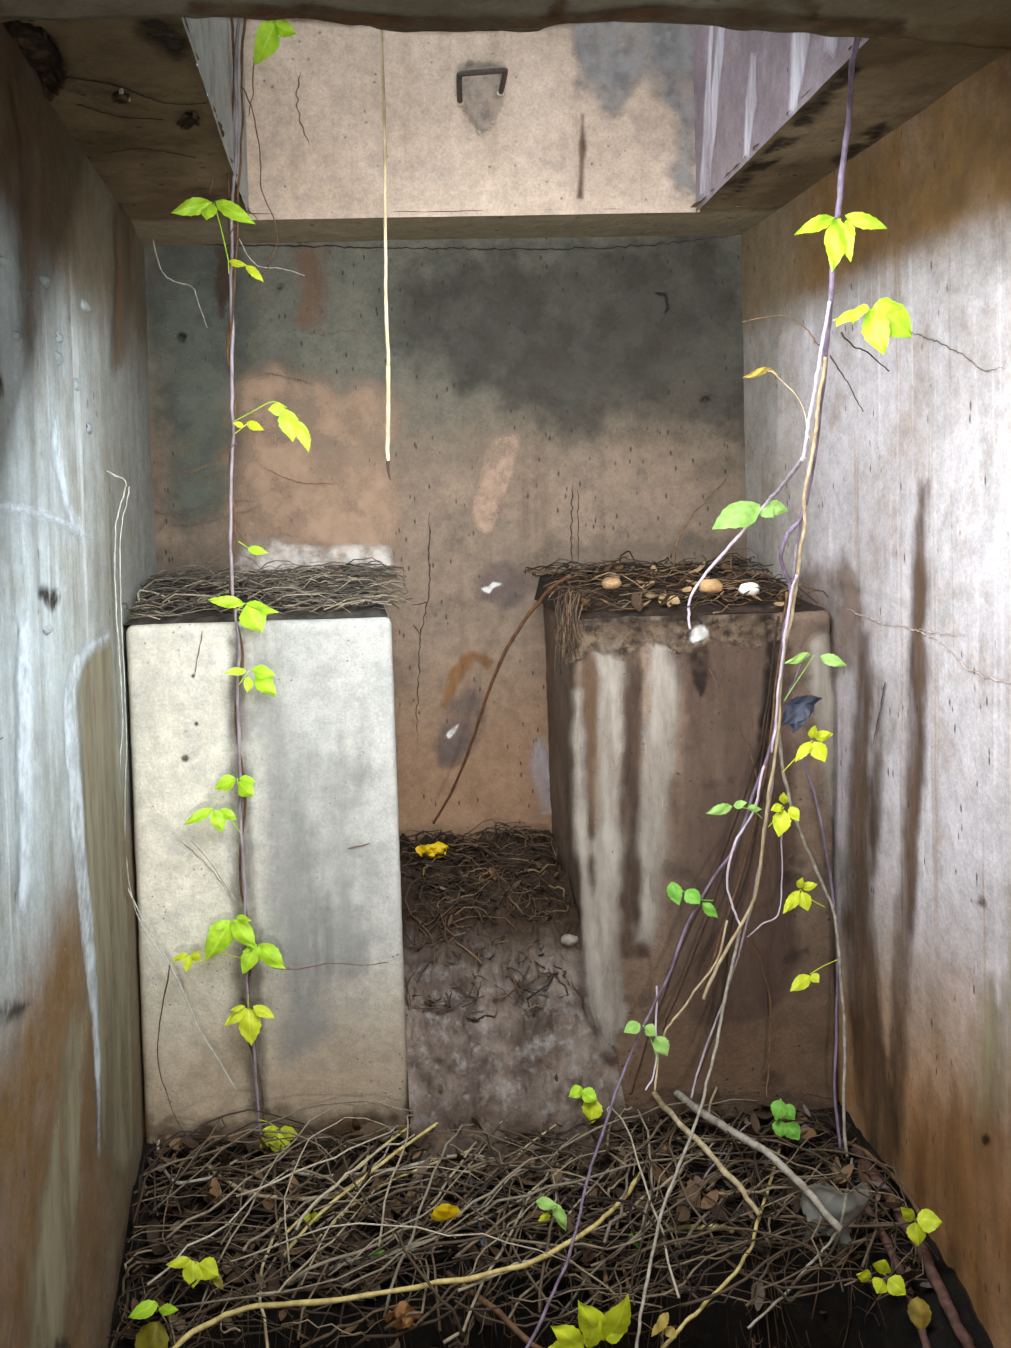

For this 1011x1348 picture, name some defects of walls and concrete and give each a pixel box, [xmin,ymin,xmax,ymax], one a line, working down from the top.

spalling [2,20,65,102]
water stain [191,4,905,194]
crack [414,512,431,743]
water stain [562,610,795,1045]
rust [5,1003,25,1019]